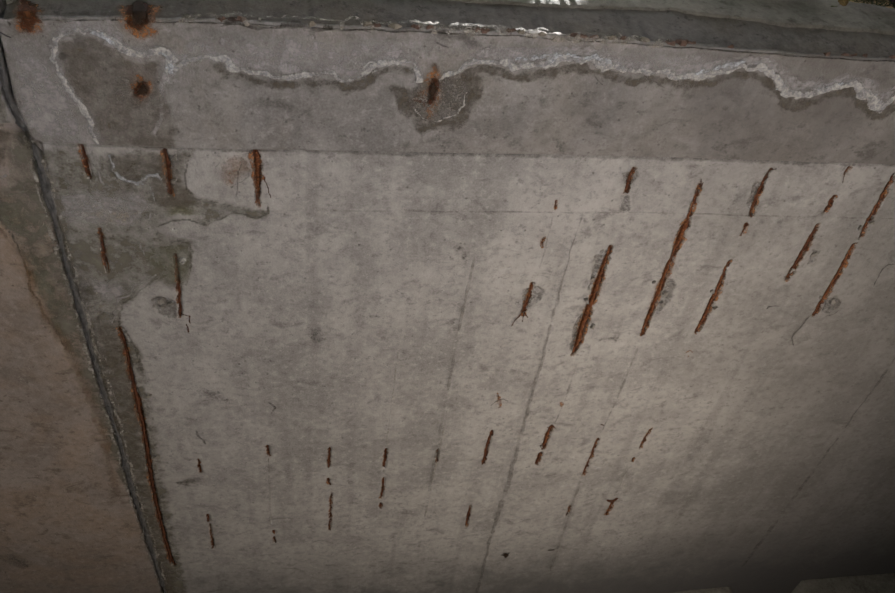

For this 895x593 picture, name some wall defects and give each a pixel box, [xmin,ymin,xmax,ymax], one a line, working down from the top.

corrosion [118,0,161,40]
leakage [439,43,895,120]
corrosion [248,149,271,207]
corrosion [621,167,637,211]
corrosion [740,168,777,236]
corrosion [640,179,704,336]
corrosion [785,224,819,281]
corrosion [812,173,894,316]
corrosion [512,282,541,326]
corrosion [570,245,612,354]
corrosion [694,260,732,334]
corrosion [116,326,177,565]